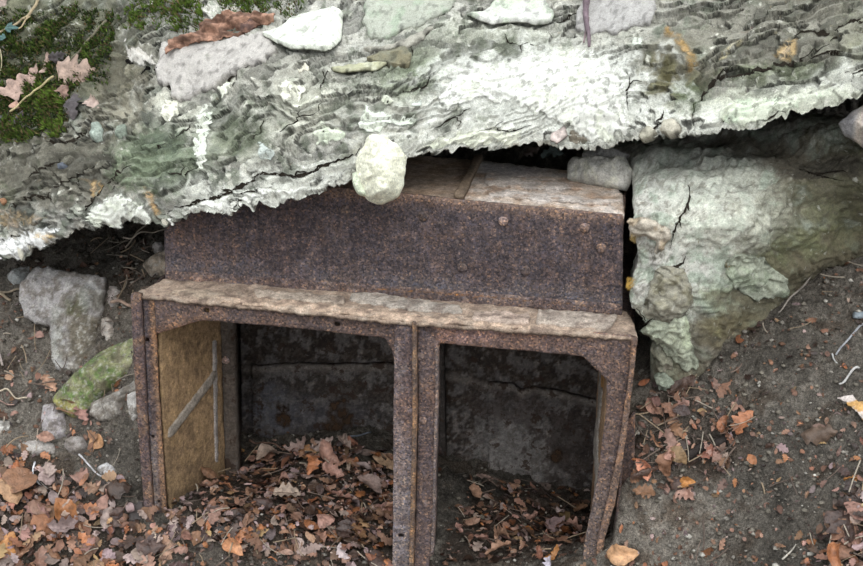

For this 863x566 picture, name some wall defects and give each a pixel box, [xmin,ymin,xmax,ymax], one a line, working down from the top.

crack [692,18,863,126]
crack [1,131,131,243]